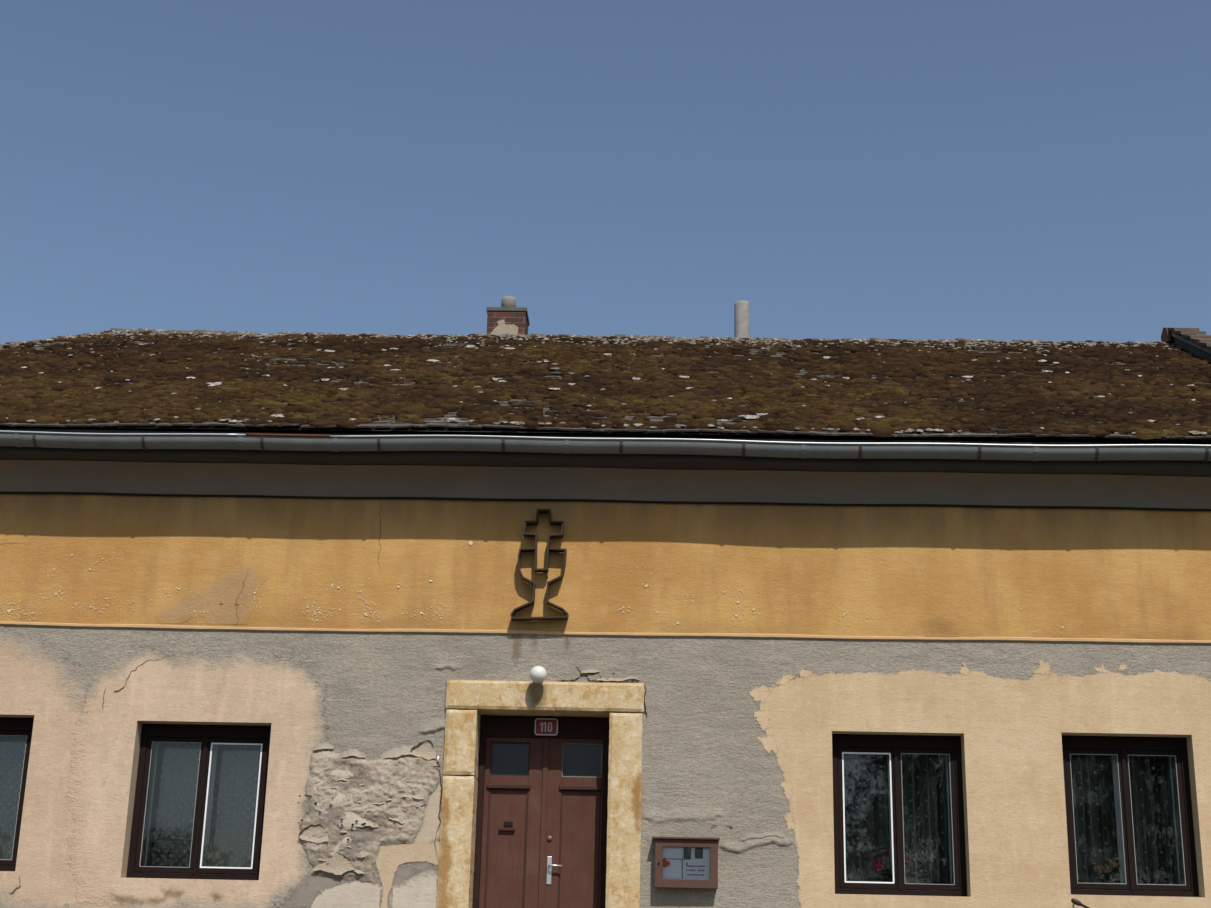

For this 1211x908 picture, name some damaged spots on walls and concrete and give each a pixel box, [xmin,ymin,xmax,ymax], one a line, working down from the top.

crack [102,655,169,712]
spalling [298,740,441,885]